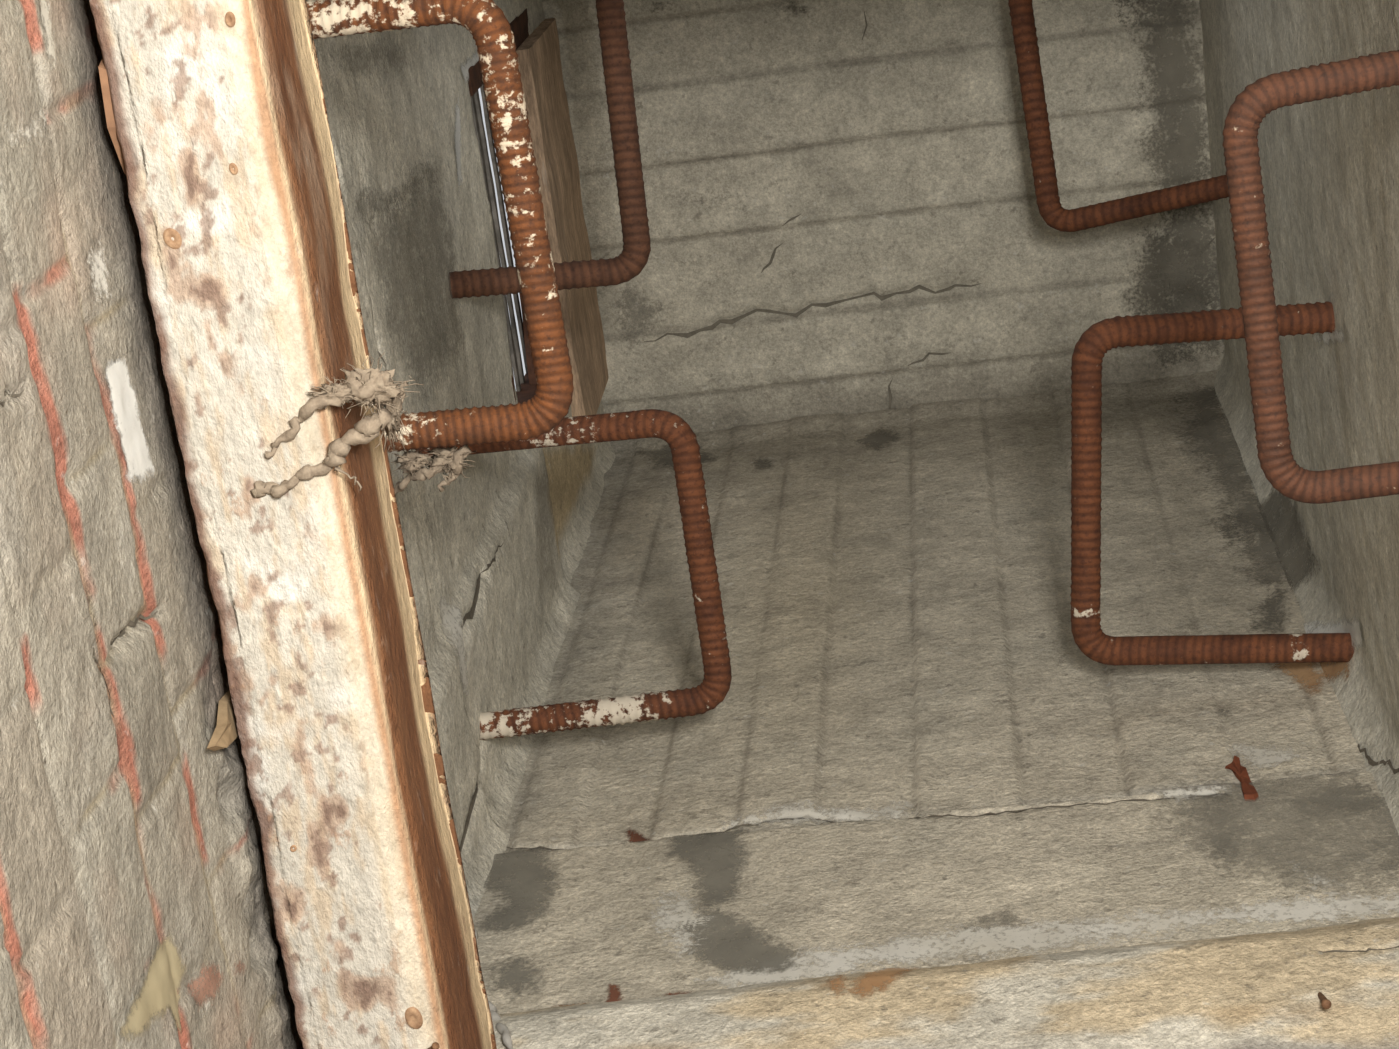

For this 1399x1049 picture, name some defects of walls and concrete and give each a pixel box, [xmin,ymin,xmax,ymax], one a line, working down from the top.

damp [1126,0,1212,188]
crack [761,214,801,273]
damp [1123,204,1221,315]
crack [644,283,982,342]
crack [461,544,503,627]
corrosion [1225,755,1259,802]
crack [1357,744,1399,774]
damp [477,848,560,930]
damp [490,955,548,999]